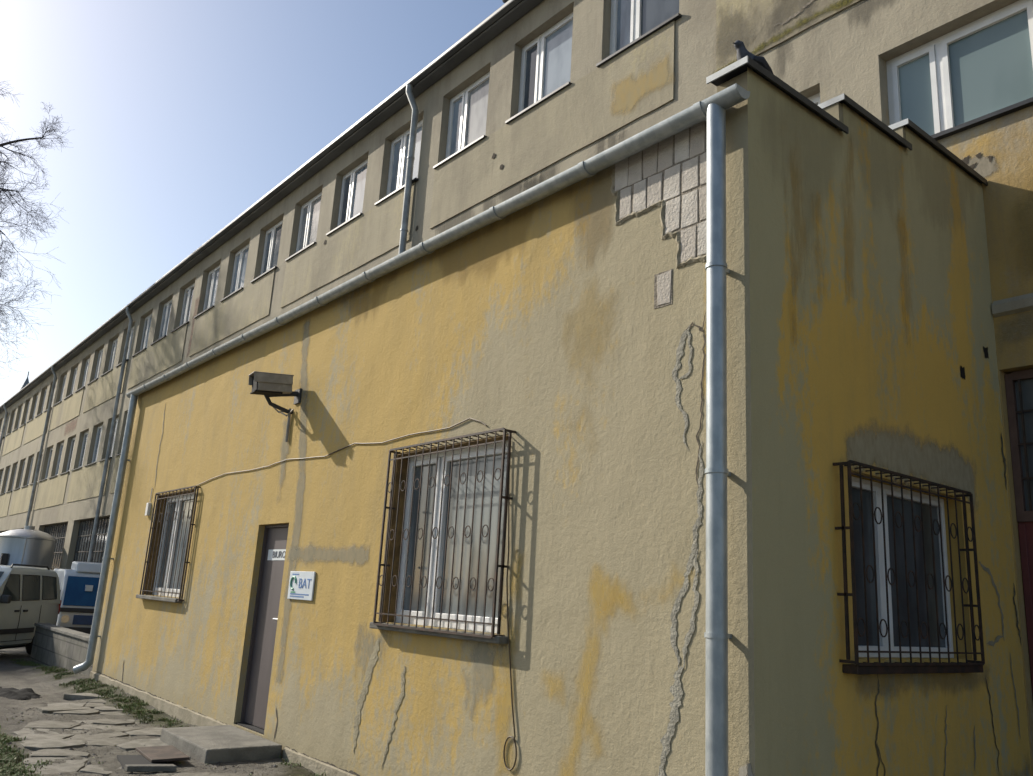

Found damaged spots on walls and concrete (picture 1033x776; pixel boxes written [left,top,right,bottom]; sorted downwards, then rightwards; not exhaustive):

spalling [610,121,707,309]
spalling [962,152,997,178]
crack [658,313,706,776]
crack [96,662,228,725]
crack [273,638,406,776]
crack [875,674,886,776]